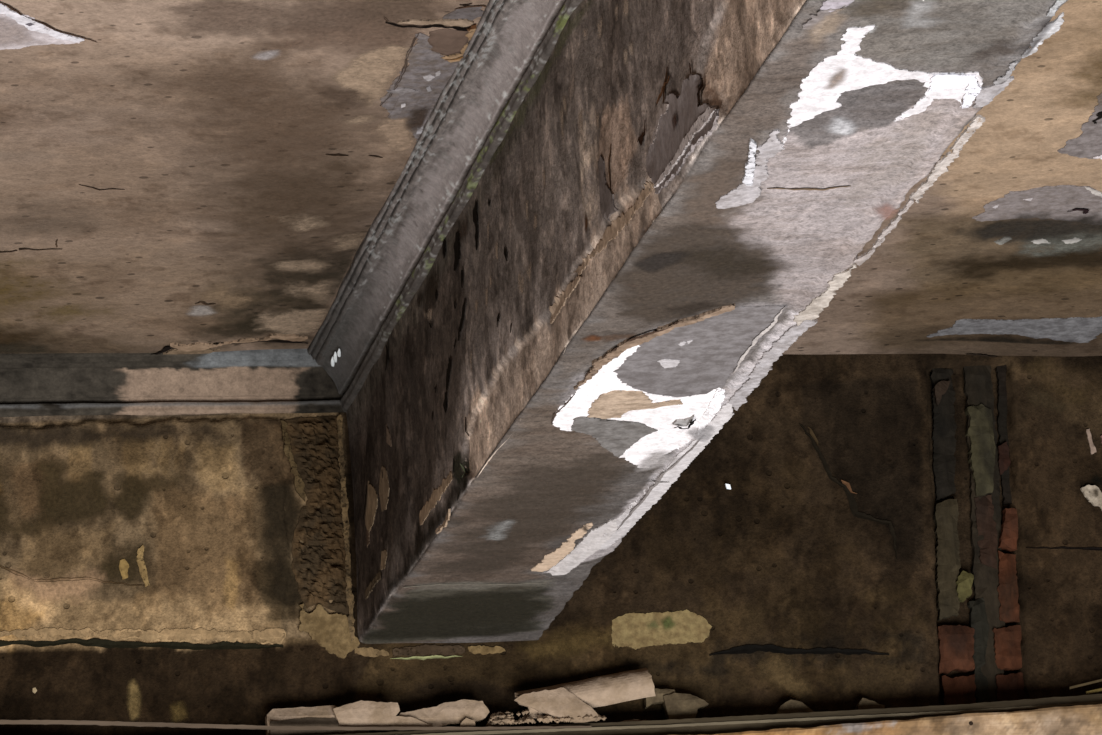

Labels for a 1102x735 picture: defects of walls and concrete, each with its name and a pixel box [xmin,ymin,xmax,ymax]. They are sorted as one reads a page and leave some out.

peeling [0,2,96,50]
leakage [179,0,430,52]
crack [0,239,58,253]
leakage [615,163,781,322]
peeling [972,185,1102,256]
peeling [404,0,1066,589]
peeling [926,316,1102,344]
leakage [0,462,165,535]
leakage [99,545,150,587]
spalling [0,414,505,660]
leakage [363,453,545,640]
spalling [527,609,712,655]